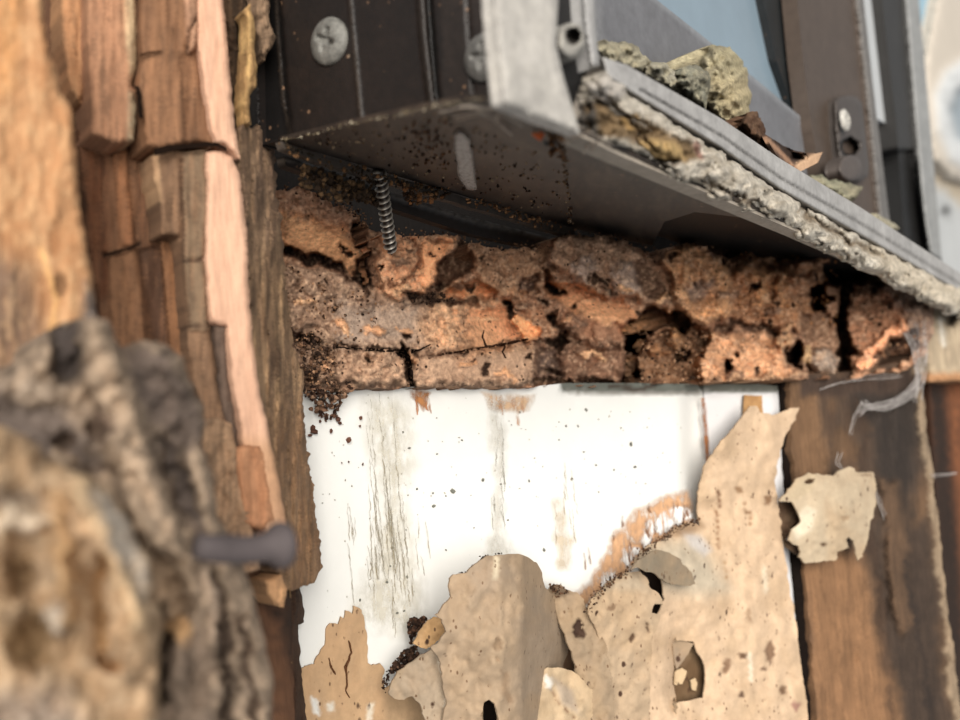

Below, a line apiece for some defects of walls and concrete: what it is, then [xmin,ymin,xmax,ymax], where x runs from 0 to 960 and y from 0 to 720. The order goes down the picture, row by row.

crack [133,86,143,119]
crack [153,141,227,156]
crack [336,330,528,386]
leakage [365,450,456,634]
peeling [537,395,808,720]
peeling [388,617,446,720]
peeling [482,700,498,720]